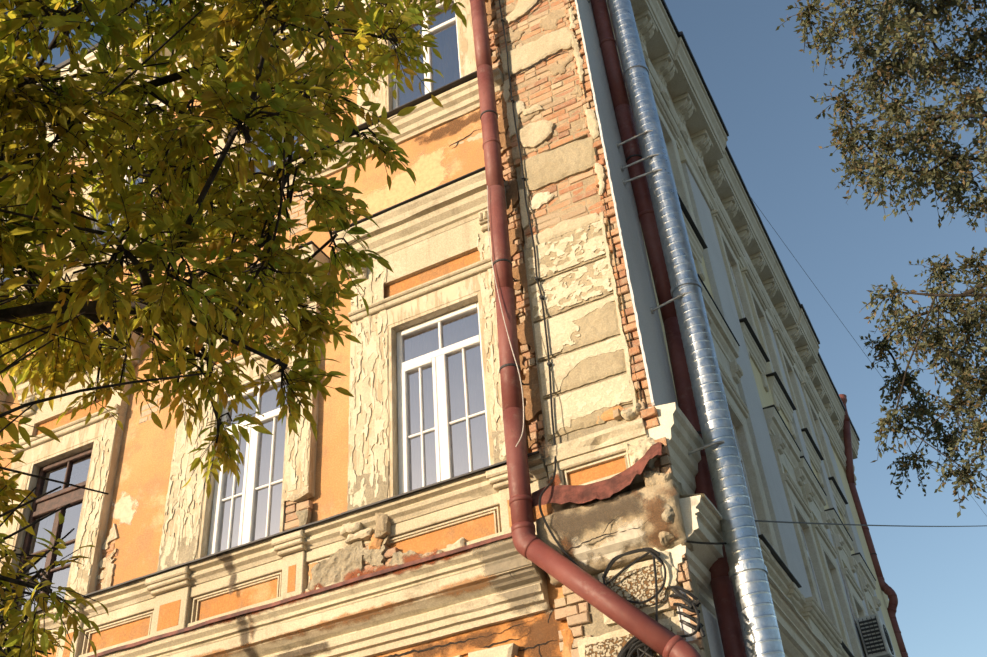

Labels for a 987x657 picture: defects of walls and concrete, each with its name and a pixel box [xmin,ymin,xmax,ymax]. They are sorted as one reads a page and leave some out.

peeling [66,414,119,600]
peeling [139,385,214,571]
peeling [284,391,313,531]
peeling [307,264,468,591]
peeling [477,231,506,464]
spalling [485,0,706,657]
crack [566,516,648,551]
damp [236,615,258,657]